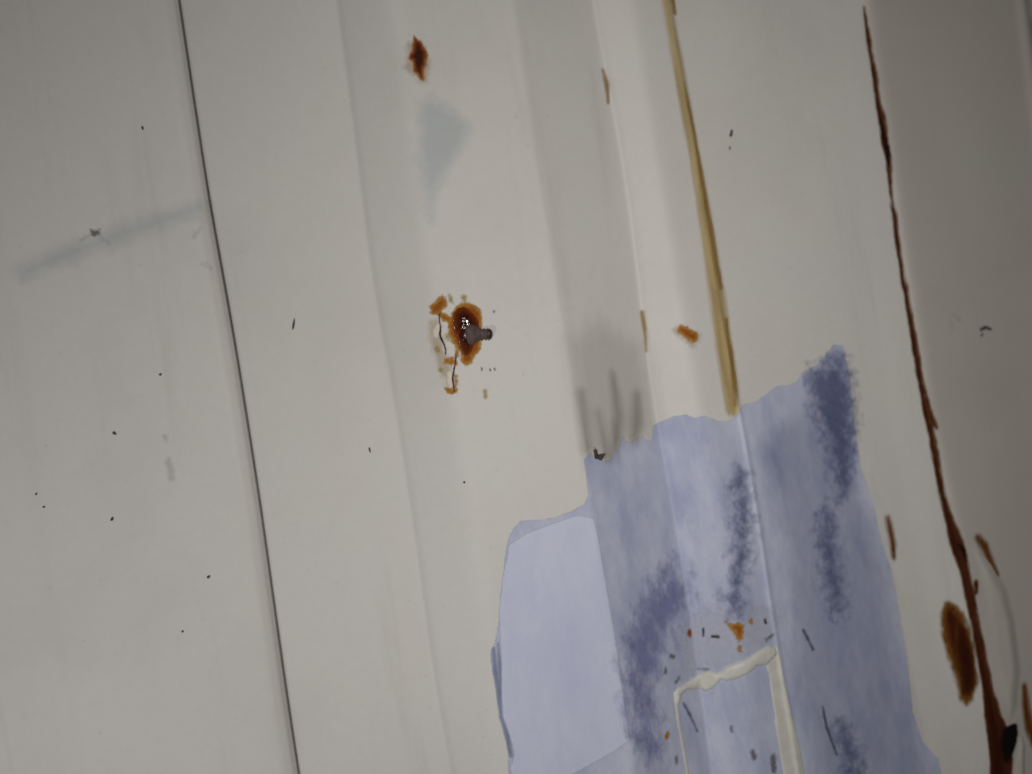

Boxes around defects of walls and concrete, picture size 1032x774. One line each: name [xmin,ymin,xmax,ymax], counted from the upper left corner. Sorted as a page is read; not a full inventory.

rust [409,37,428,80]
rust [430,295,495,395]
rust [678,325,698,343]
rust [863,7,1013,774]
rust [1022,684,1032,745]